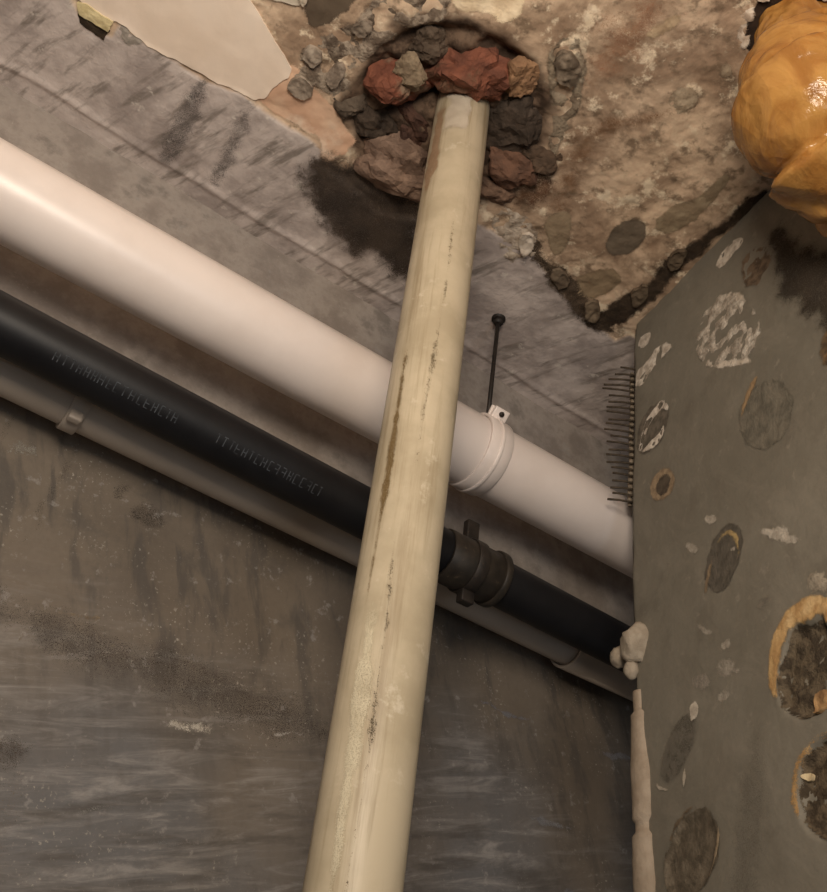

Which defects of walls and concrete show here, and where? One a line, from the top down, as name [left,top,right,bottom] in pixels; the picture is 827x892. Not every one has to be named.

spalling [736,0,782,51]
water stain [294,150,419,279]
spalling [77,0,768,336]
spalling [696,246,771,369]
water stain [763,221,827,336]
spalling [768,594,827,719]
spalling [790,731,827,840]